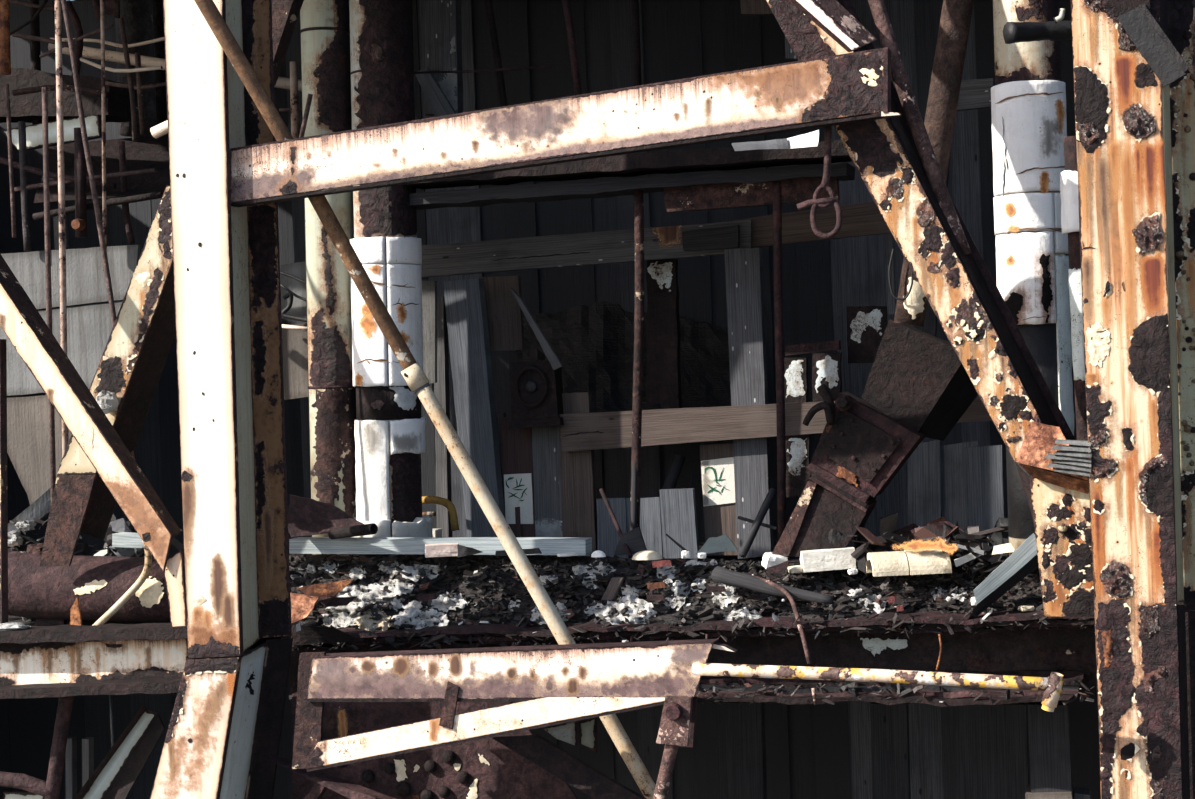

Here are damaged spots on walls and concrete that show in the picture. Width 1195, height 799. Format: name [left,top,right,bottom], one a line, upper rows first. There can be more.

corrosion [313,0,415,133]
corrosion [336,98,575,239]
corrosion [698,0,1034,461]
peeling [850,309,882,343]
peeling [903,277,926,319]
peeling [953,312,984,344]
corrosion [995,0,1195,799]
peeling [74,514,153,557]
peeling [289,545,556,651]
peeling [527,522,1090,670]
corrosion [0,553,255,799]
corrosion [308,643,712,737]